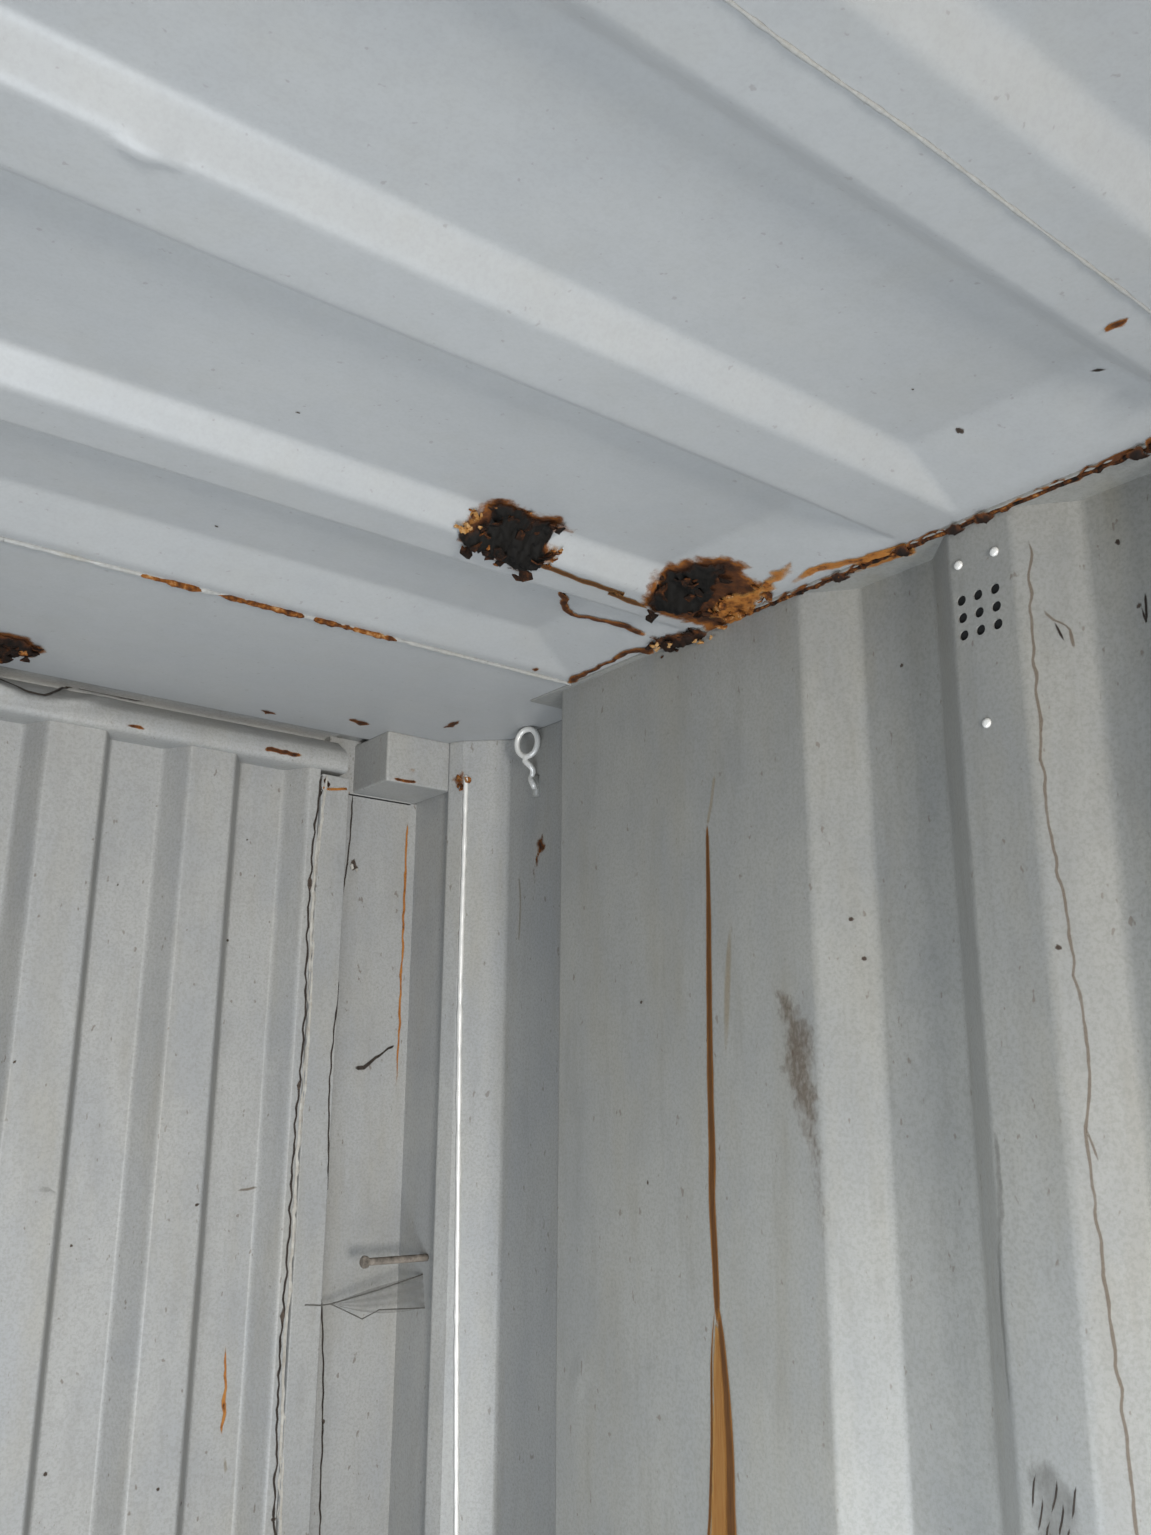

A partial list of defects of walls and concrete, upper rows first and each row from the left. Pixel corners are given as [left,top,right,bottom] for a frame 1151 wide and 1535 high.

rust [1105,319,1128,332]
rust [0,633,45,664]
rust [454,438,1151,683]
rust [706,827,736,1535]